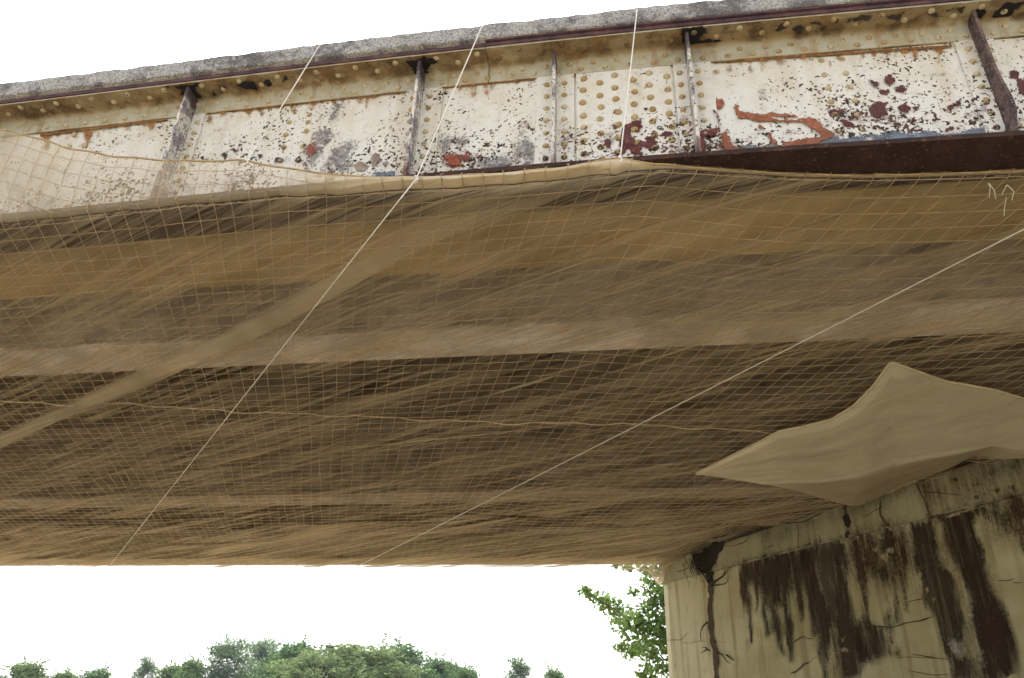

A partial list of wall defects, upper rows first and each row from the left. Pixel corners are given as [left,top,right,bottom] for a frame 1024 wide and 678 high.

peeling [274,100,396,176]
peeling [436,132,535,172]
peeling [699,74,985,151]
peeling [1008,70,1024,95]
crack [677,566,719,678]
water stain [739,494,1024,678]